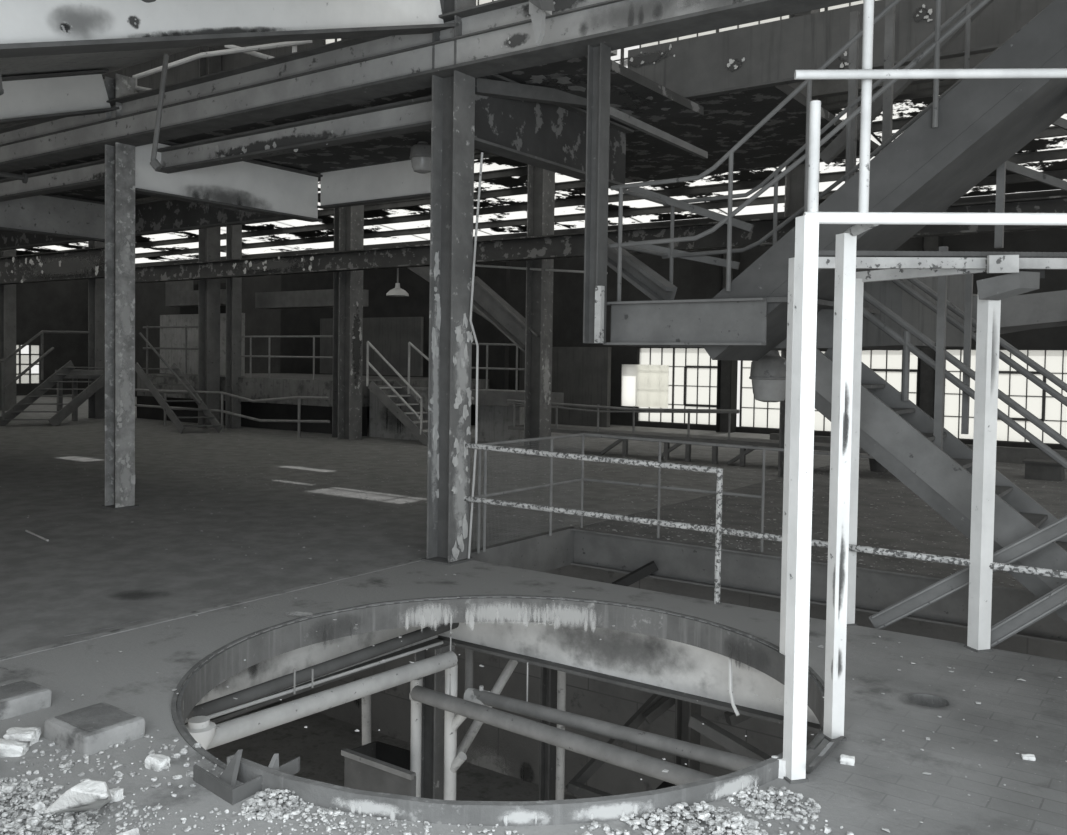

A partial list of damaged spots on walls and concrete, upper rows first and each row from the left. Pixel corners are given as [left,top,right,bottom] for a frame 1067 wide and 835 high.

damp [194,190,252,211]
peeling [11,255,105,283]
peeling [233,256,314,274]
peeling [430,251,473,560]
damp [406,605,452,628]
damp [466,604,660,666]